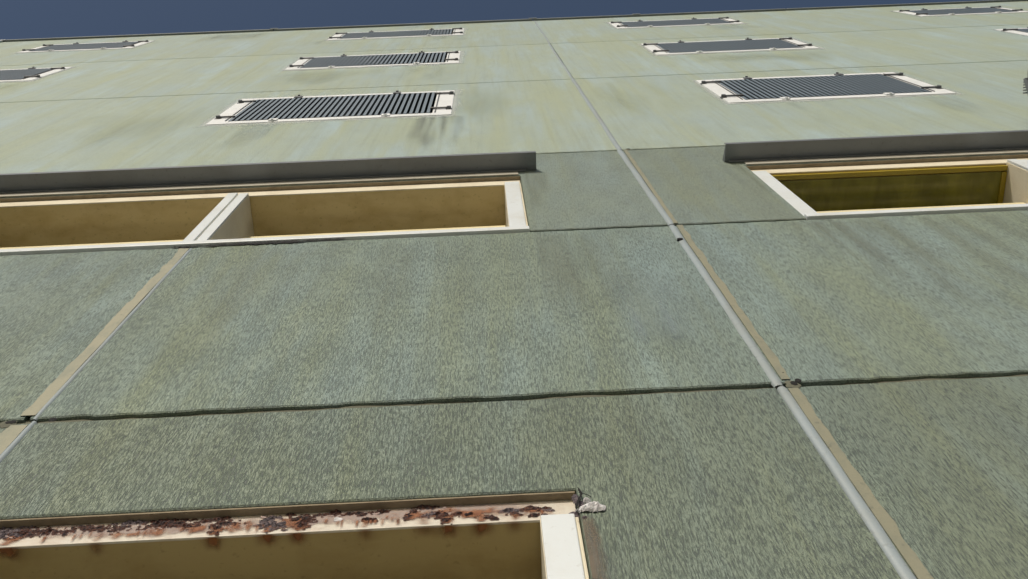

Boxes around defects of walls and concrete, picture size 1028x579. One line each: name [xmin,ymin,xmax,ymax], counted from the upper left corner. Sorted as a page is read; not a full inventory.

corrosion [206,529,219,547]
corrosion [291,525,303,542]
corrosion [440,516,454,535]
corrosion [475,514,489,534]
corrosion [0,539,16,557]